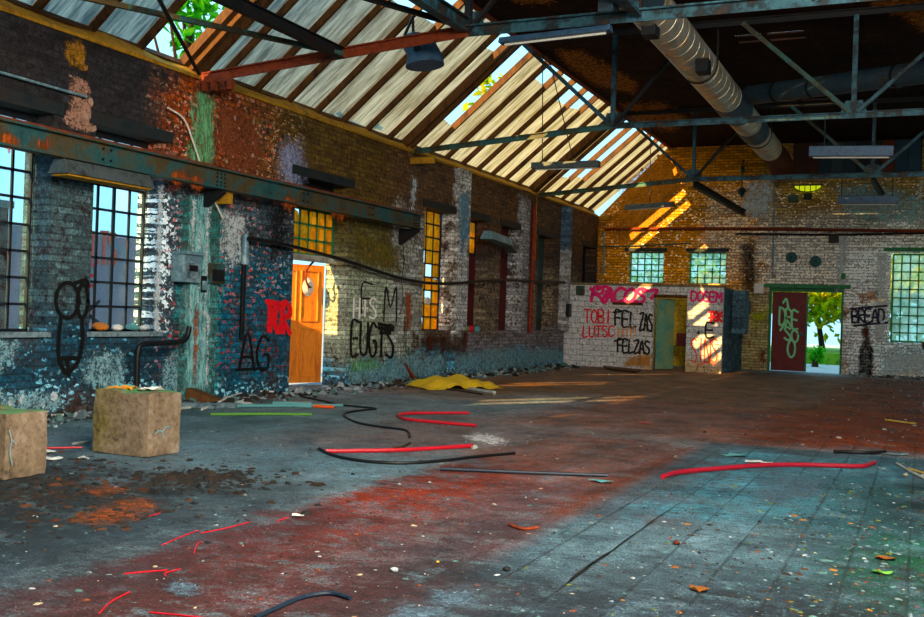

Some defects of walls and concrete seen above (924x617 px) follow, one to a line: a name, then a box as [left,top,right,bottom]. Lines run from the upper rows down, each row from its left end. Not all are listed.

flaking render [64,40,97,133]
peeling [153,185,165,331]